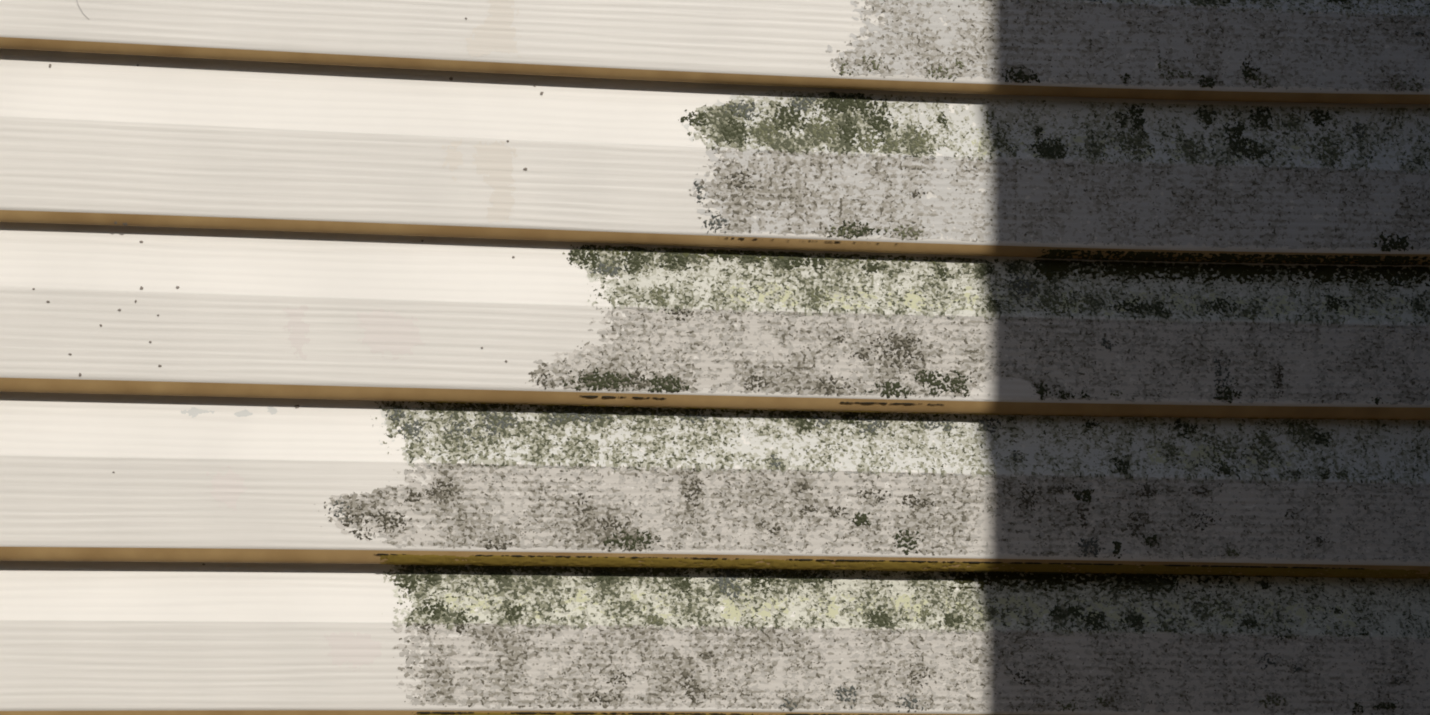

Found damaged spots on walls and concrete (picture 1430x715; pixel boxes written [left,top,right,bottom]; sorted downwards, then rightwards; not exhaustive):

damp [314,0,1430,715]